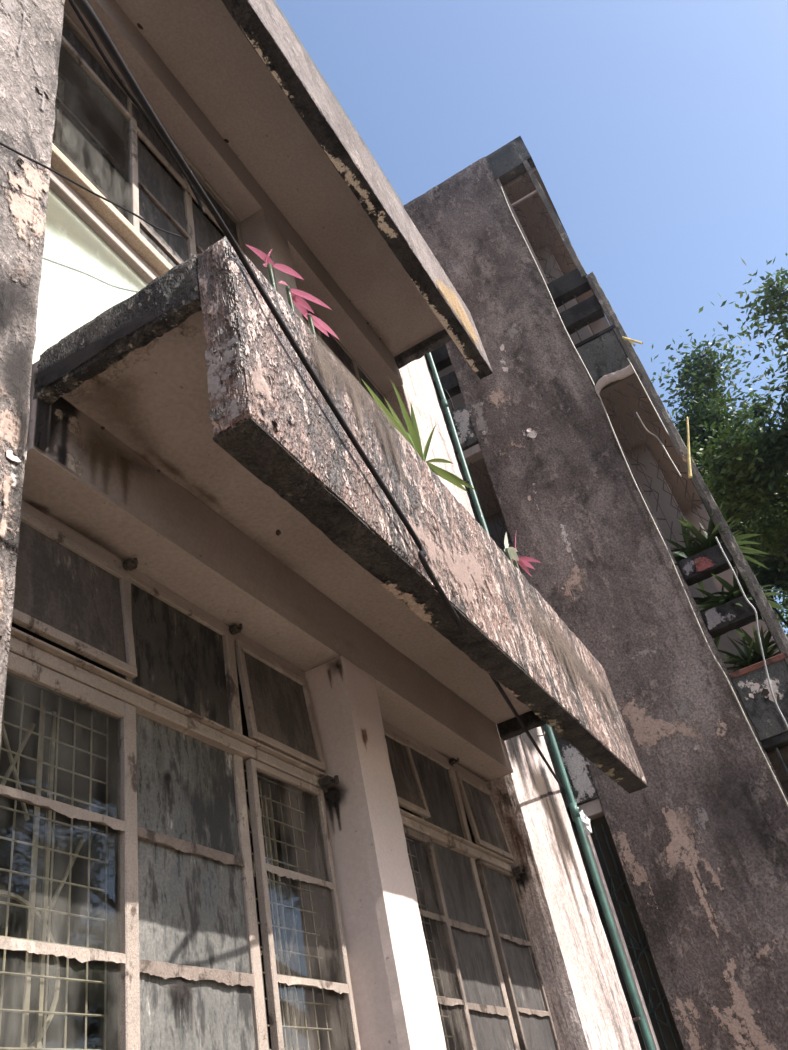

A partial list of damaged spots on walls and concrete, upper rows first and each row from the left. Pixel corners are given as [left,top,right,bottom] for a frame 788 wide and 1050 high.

peeling [5,157,50,286]
spalling [381,581,440,628]
peeling [406,506,495,618]
peeling [483,669,624,803]
peeling [618,697,728,752]
water stain [506,727,585,927]
peeling [612,831,658,909]
peeling [661,804,726,939]
peeling [672,957,781,1050]
peeling [751,935,784,961]